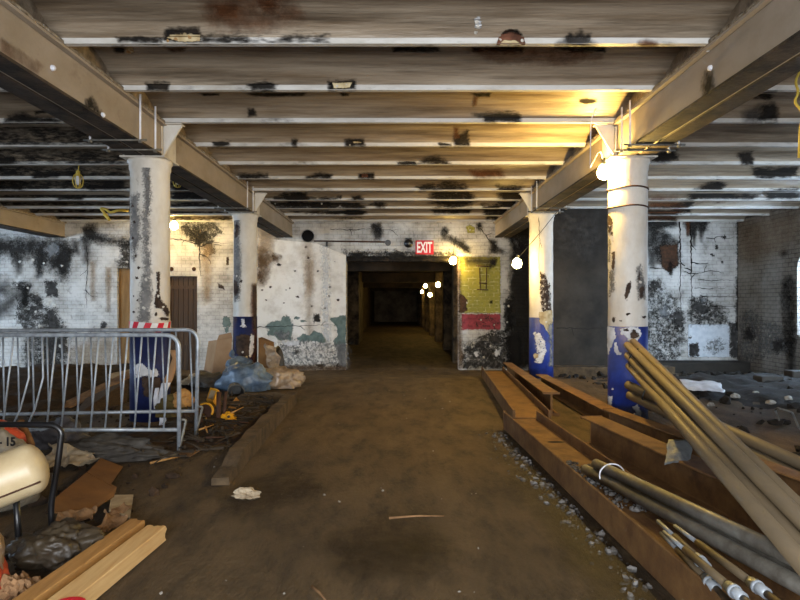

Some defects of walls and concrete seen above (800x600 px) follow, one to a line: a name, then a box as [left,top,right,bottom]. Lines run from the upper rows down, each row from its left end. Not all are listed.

water stain [745,94,773,121]
water stain [34,253,46,278]
water stain [57,239,94,296]
water stain [190,229,216,298]
peeling [265,305,352,370]
peeling [533,271,553,366]
crack [650,222,733,307]
peeling [607,215,789,362]